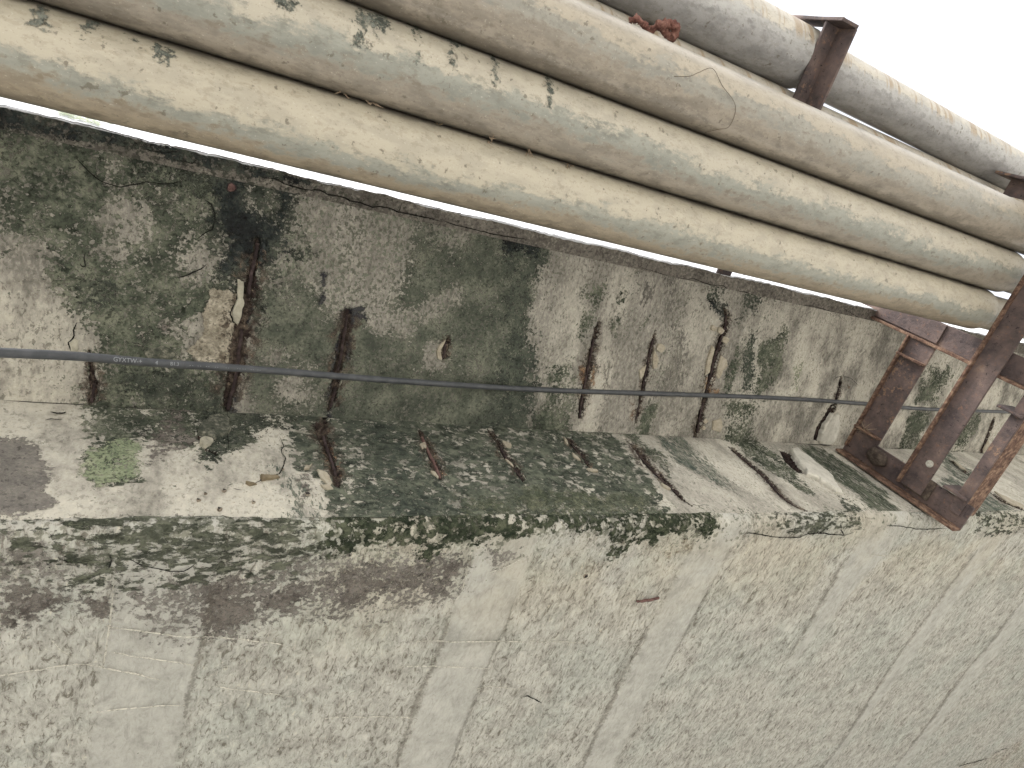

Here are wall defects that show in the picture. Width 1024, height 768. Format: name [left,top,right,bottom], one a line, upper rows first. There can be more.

crack [77,149,195,188]
damp [0,107,312,328]
damp [502,240,541,260]
damp [318,272,328,305]
damp [339,306,368,325]
damp [708,297,729,322]
flaking render [245,468,284,486]
flaking render [780,447,843,494]
crack [742,524,851,538]